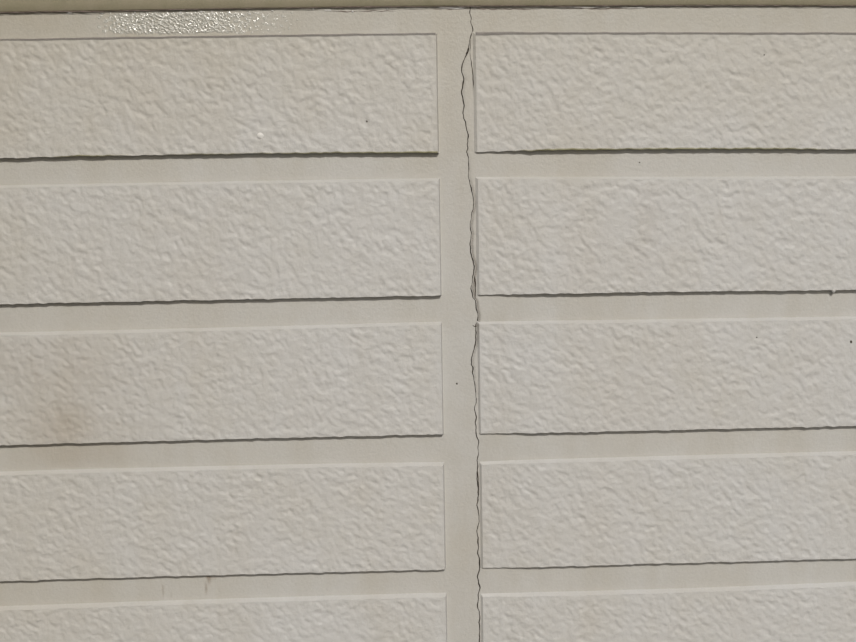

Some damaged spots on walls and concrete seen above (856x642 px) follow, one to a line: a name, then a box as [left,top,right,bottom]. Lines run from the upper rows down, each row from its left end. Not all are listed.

crack [0,8,104,16]
crack [126,5,264,13]
crack [288,5,856,642]